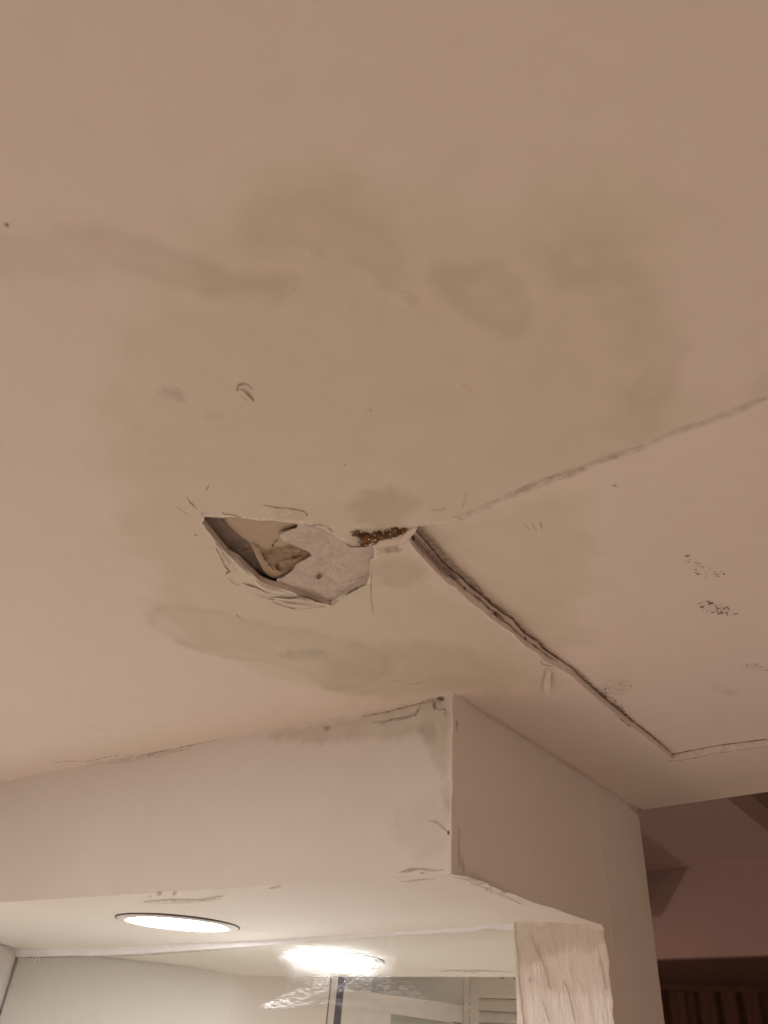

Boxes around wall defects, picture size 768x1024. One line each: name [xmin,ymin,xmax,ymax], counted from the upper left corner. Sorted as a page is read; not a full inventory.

spalling [202,505,375,610]
rust [346,527,408,547]
crack [400,527,768,761]